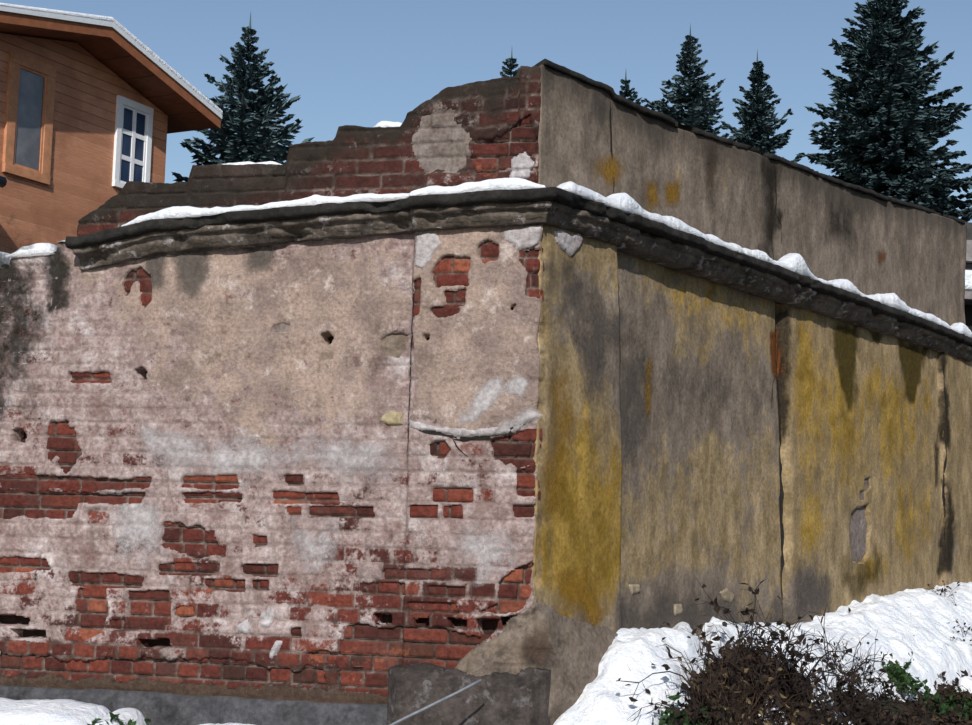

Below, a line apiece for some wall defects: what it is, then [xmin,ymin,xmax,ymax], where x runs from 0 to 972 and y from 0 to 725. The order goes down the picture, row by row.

leakage [46,245,70,311]
spalling [413,225,544,318]
corrosion [770,332,783,378]
leakage [834,325,857,409]
spalling [0,421,152,519]
spalling [273,475,375,519]
peeling [379,376,542,519]
crack [771,376,784,600]
crack [935,428,947,550]
leakage [936,386,955,575]
spalling [158,521,279,592]
leakage [619,569,830,634]